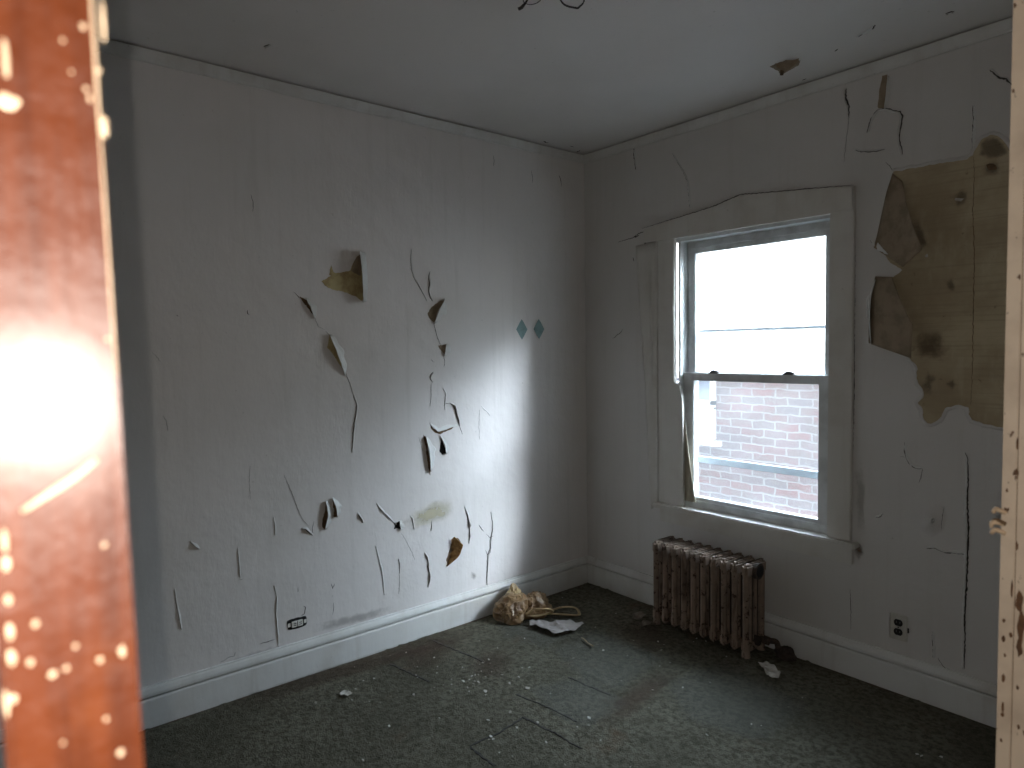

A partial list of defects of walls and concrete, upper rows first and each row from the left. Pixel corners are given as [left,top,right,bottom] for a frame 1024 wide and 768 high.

peeling [770,58,800,76]
crack [844,90,903,168]
crack [620,154,849,261]
crack [464,507,494,586]
crack [961,453,970,669]